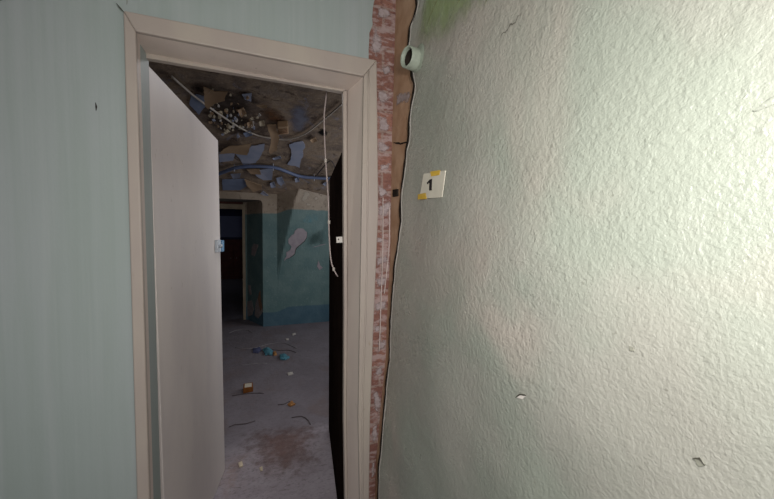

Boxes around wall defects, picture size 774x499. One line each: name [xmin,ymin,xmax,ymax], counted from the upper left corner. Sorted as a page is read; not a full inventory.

peeling [284,228,307,261]